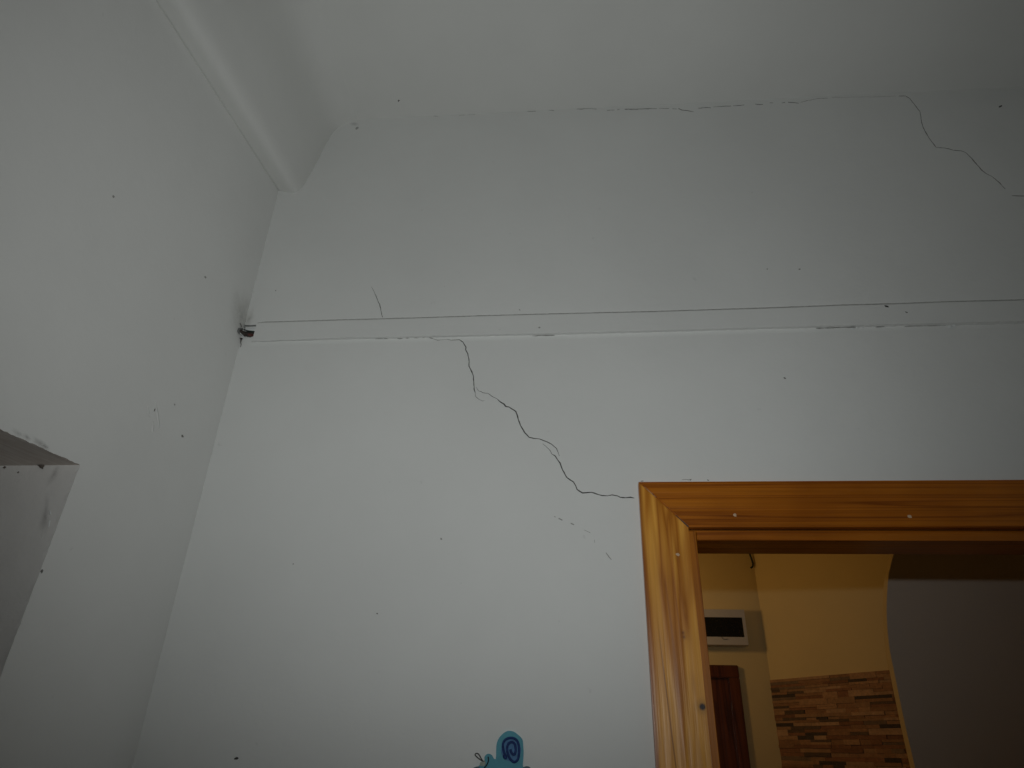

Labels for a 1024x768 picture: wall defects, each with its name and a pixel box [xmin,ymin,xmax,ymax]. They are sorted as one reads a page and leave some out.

crack [880,96,1017,196]
crack [372,288,1024,498]